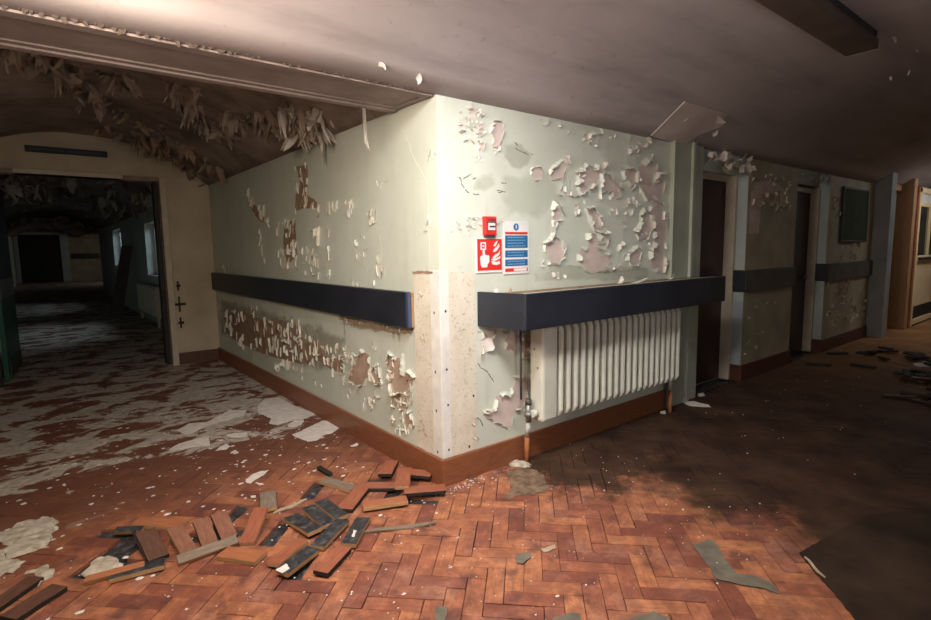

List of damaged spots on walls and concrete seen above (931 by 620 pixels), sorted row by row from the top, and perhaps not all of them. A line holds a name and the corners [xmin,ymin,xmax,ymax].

peeling [458,101,505,164]
peeling [246,162,354,280]
peeling [529,101,728,284]
flaking render [223,270,531,459]
peeling [216,432,248,454]